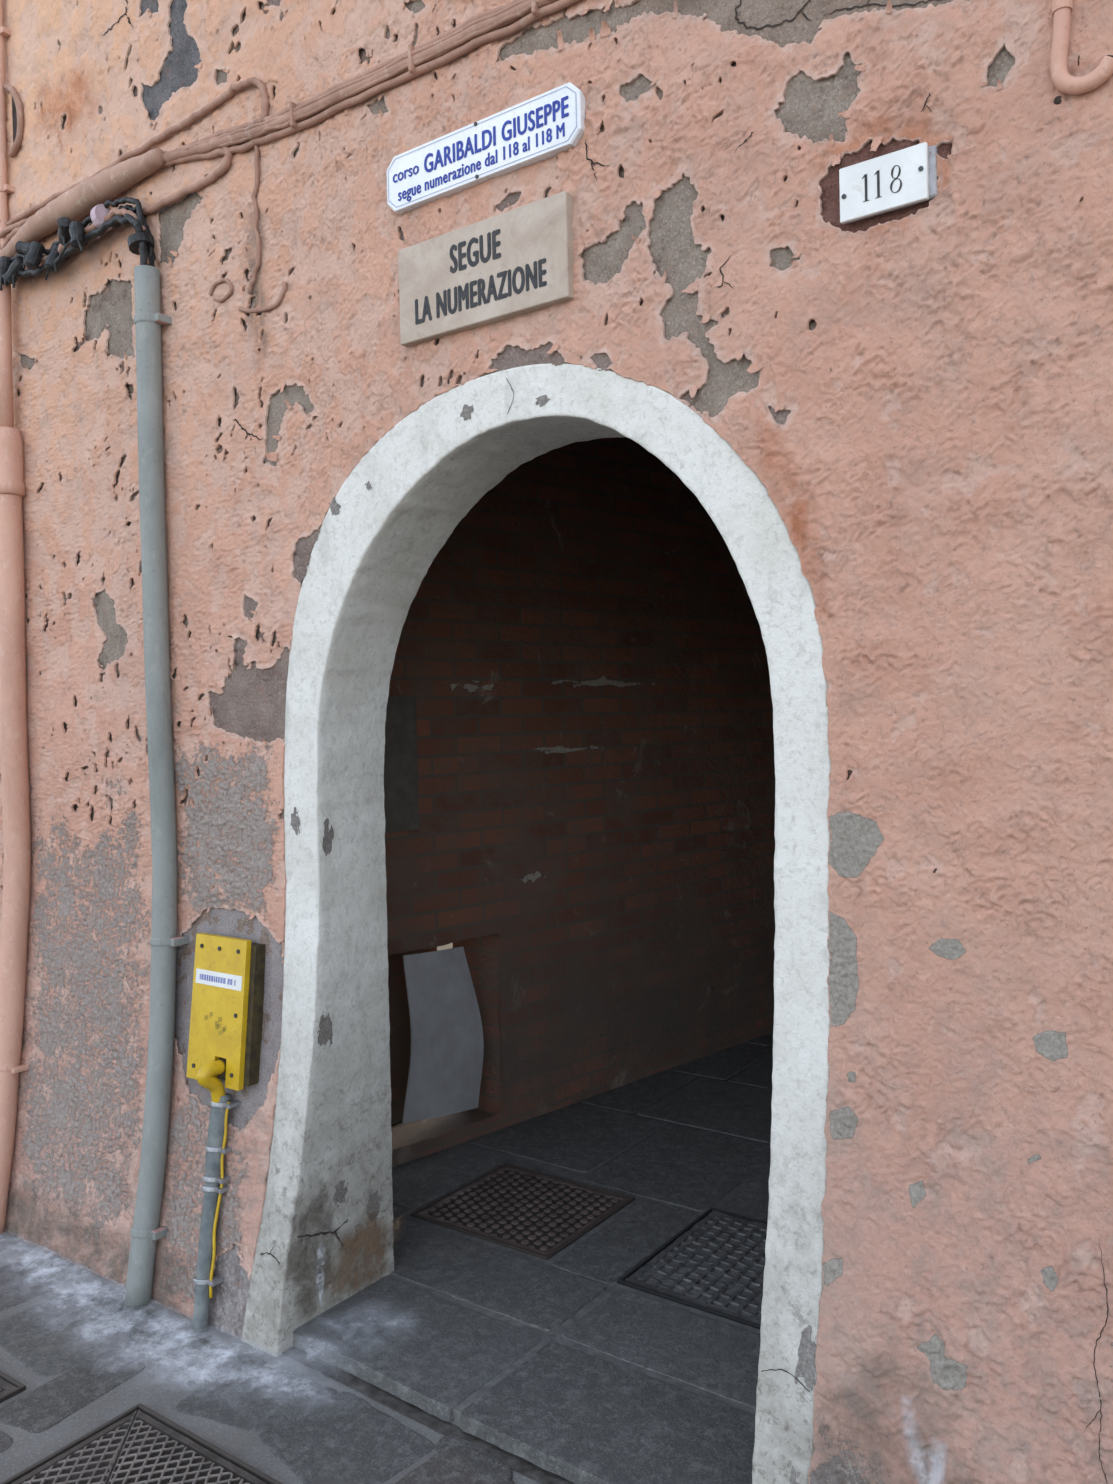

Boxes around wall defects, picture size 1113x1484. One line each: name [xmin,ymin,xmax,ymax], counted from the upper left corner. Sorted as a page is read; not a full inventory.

peeling [136,0,229,131]
flaking render [495,0,970,71]
peeling [775,53,957,233]
peeling [81,278,135,367]
peeling [577,175,763,417]
peeling [260,381,318,466]
flaking render [174,596,290,922]
peeling [828,811,884,878]
peeling [828,911,859,1026]
flaking render [790,1419,890,1484]